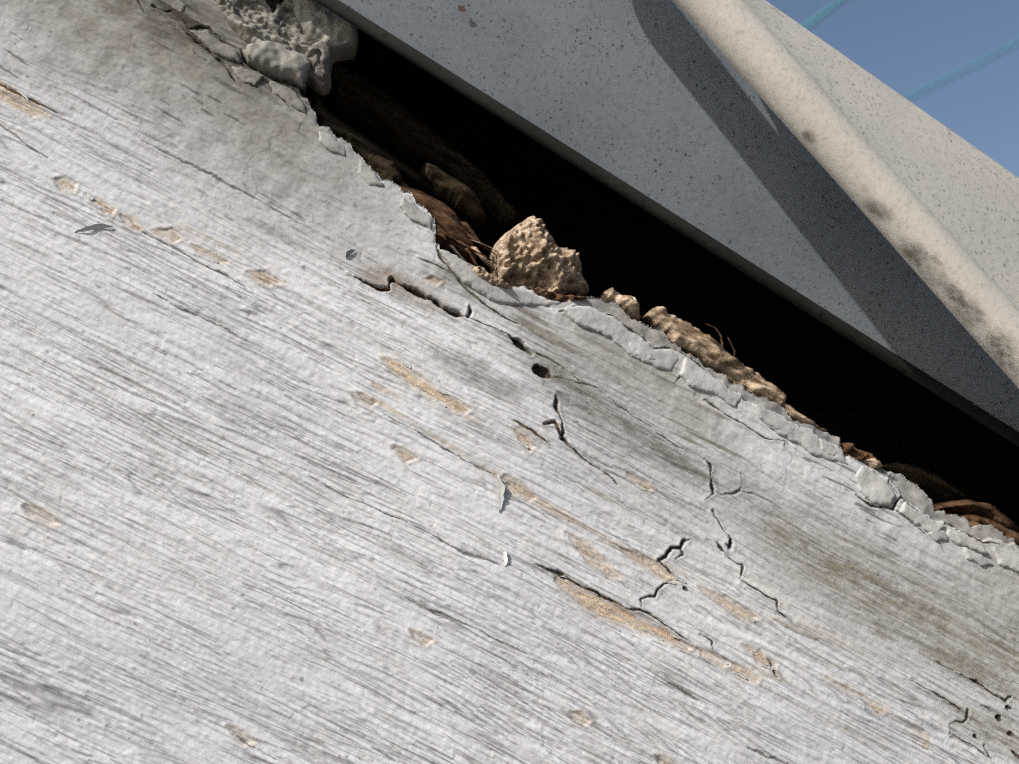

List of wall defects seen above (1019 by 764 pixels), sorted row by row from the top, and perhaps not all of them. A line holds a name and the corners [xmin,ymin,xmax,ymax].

peeling [190,30,308,115]
peeling [319,131,346,157]
peeling [357,159,384,187]
peeling [384,359,467,414]
crack [354,249,640,483]
hole [532,364,552,379]
crack [708,402,785,445]
peeling [564,306,1019,576]
peeling [497,474,534,512]
crack [705,460,786,617]
crack [536,539,713,643]
crack [916,661,1019,759]